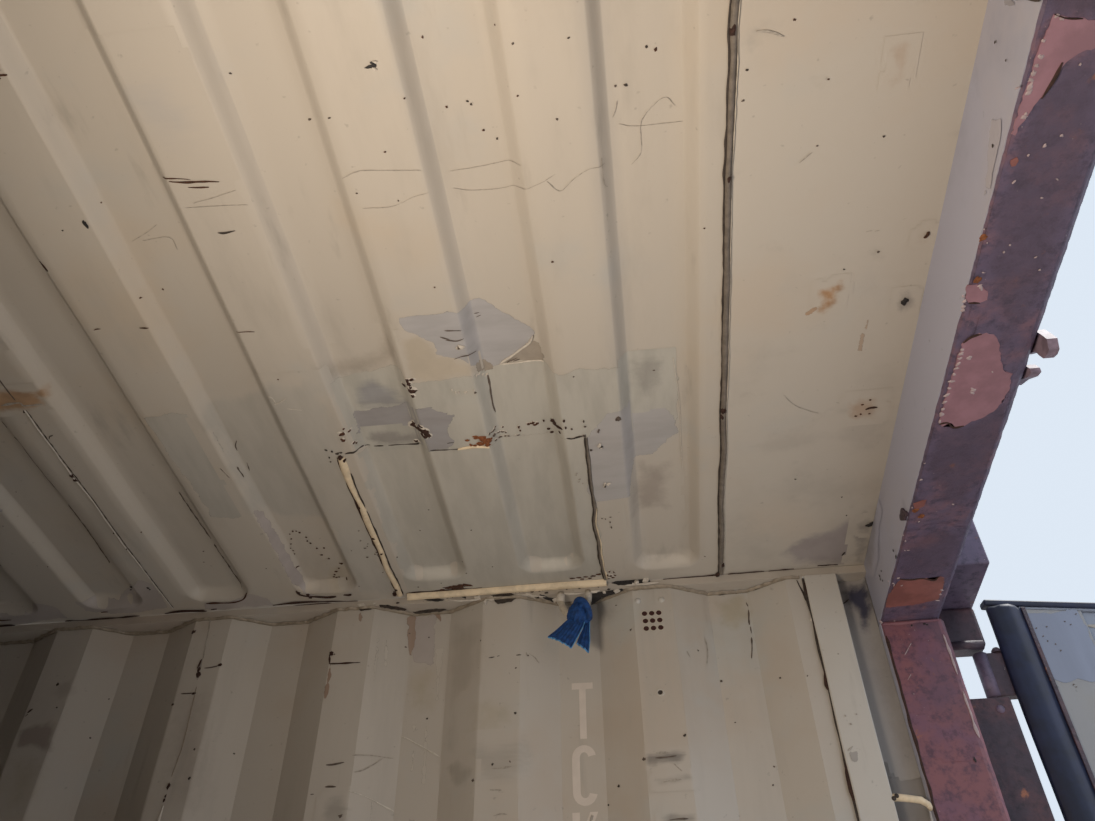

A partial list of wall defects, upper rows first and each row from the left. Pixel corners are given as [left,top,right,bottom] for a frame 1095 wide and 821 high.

corrosion [1040,0,1095,31]
peeling [1011,14,1095,135]
corrosion [969,49,1095,357]
peeling [960,272,988,312]
peeling [938,333,1013,429]
corrosion [465,419,600,447]
corrosion [879,397,1010,582]
peeling [881,571,944,608]
corrosion [886,636,940,821]